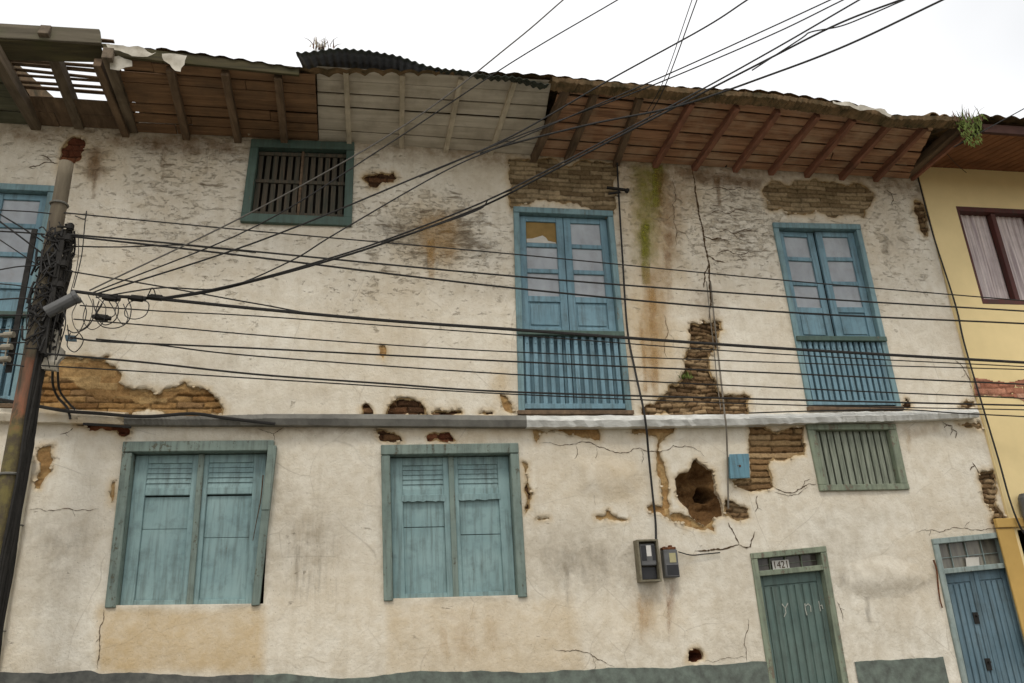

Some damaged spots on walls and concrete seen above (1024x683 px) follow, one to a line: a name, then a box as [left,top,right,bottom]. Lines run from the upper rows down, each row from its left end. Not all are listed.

flaking render [508,158,619,219]
flaking render [762,179,874,218]
leakage [642,225,653,299]
crack [669,171,757,318]
flaking render [40,356,224,416]
flaking render [386,398,462,415]
flaking render [641,321,750,415]
crack [544,441,704,461]
spalling [632,428,749,531]
crack [699,479,815,552]
flaking render [732,426,806,492]
flaking render [978,470,1007,525]